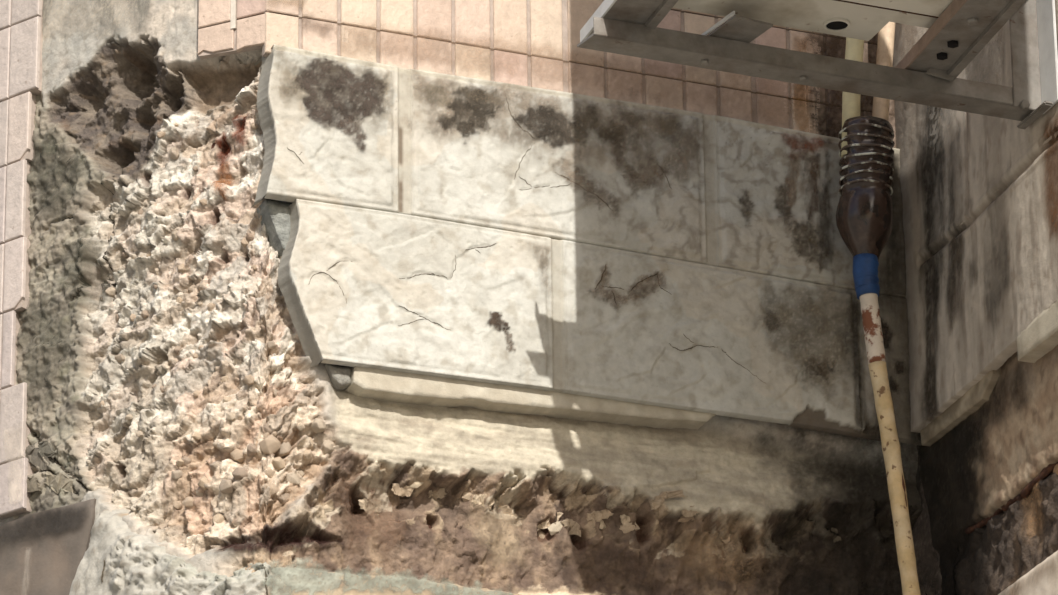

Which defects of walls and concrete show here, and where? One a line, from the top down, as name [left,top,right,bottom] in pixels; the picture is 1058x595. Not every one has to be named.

mould [284,59,385,150]
mould [427,86,502,137]
crack [507,102,614,212]
damp [515,106,666,187]
crack [399,243,496,279]
spalling [46,37,903,595]
damp [488,312,515,351]
crack [595,265,671,303]
crack [669,335,765,383]
spalling [25,440,73,494]
spalling [900,448,920,533]
rust [965,462,1058,535]